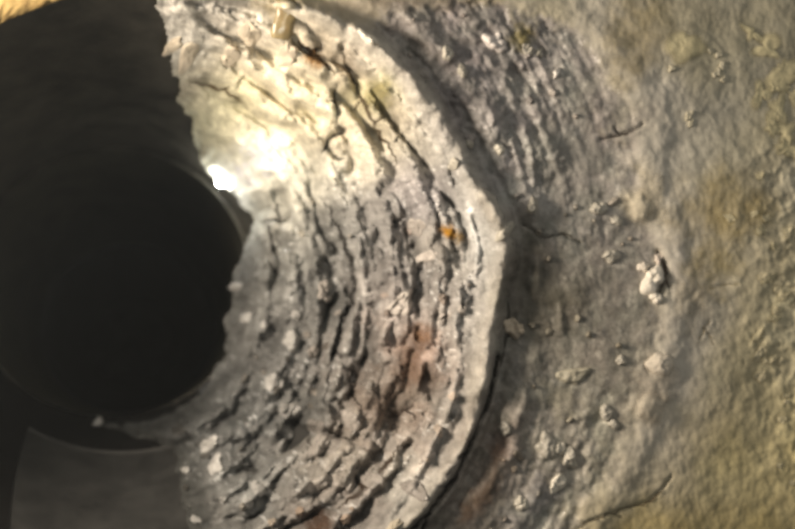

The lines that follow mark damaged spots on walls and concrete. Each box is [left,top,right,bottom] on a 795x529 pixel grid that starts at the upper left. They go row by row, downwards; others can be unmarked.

crack [298,41,397,165]
spalling [343,0,672,529]
crack [338,444,399,509]
crack [393,405,416,420]
crack [411,356,497,529]
crack [578,476,671,529]